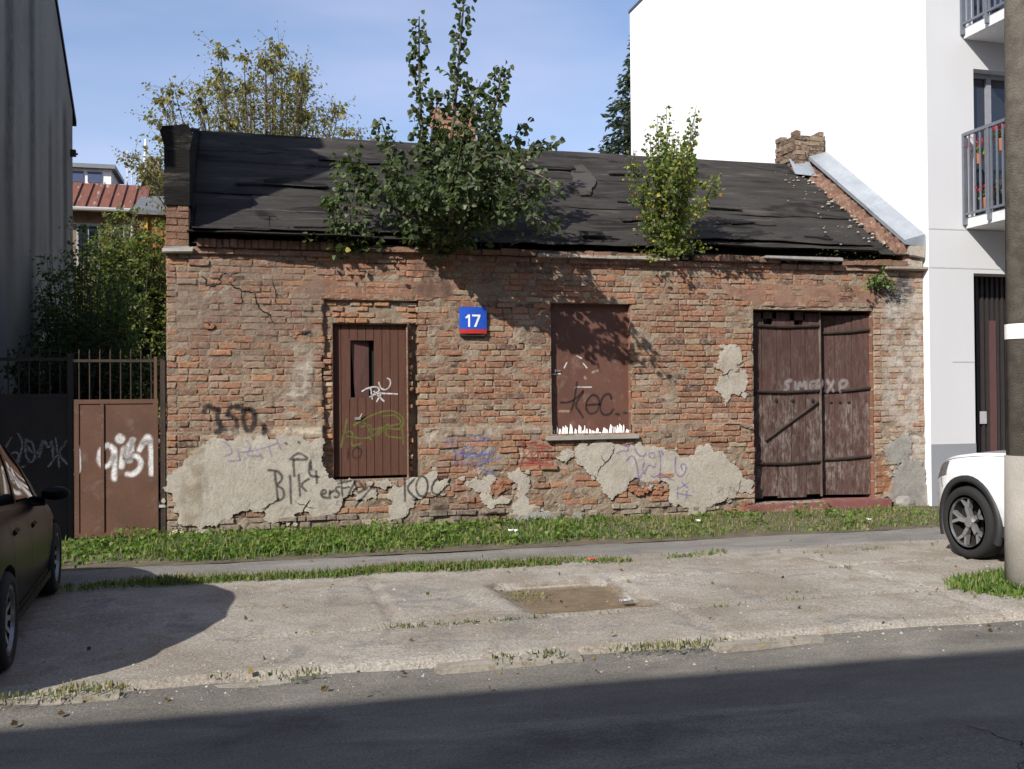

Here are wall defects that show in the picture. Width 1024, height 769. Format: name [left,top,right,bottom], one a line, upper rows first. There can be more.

crack [201,273,281,323]
peeling [713,344,748,407]
peeling [161,428,564,530]
peeling [556,440,754,515]
peeling [881,433,928,507]